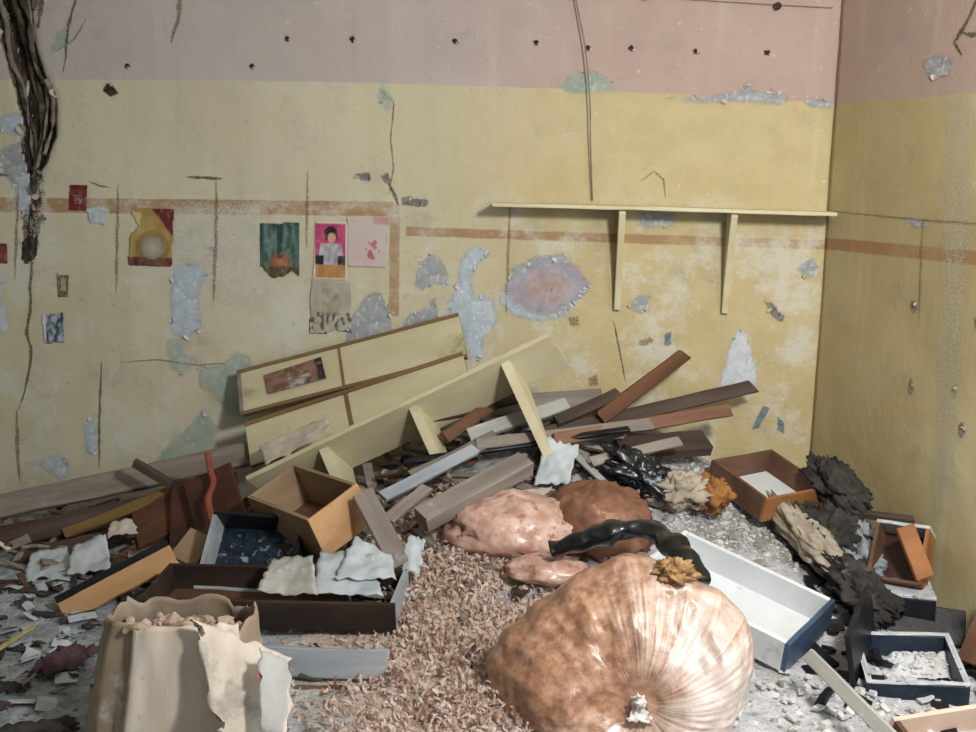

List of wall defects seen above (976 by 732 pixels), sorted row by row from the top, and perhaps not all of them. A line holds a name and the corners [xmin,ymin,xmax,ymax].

crack [953,2,976,55]
peeling [667,81,789,107]
peeling [0,110,34,215]
crack [0,0,86,481]
peeling [165,244,252,417]
flaking render [344,244,591,361]
peeling [718,326,758,387]
peeling [155,409,220,462]